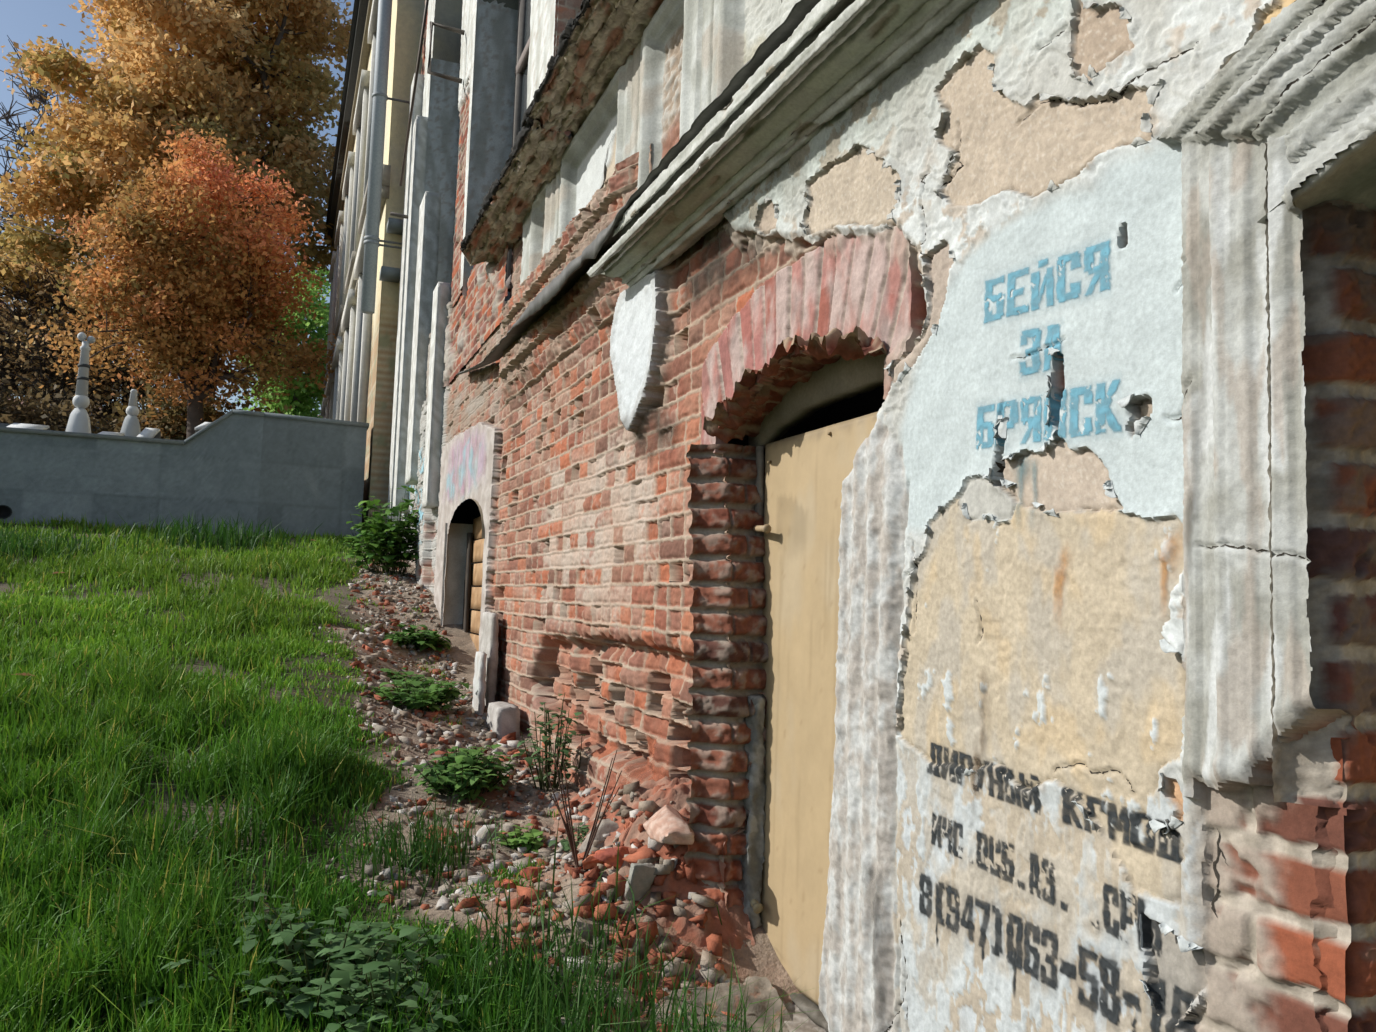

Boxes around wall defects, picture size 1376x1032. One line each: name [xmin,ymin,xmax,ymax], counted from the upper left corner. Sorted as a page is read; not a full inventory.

peeling [932,0,1165,206]
crack [1248,0,1376,135]
spalling [1117,222,1128,248]
spalling [495,143,901,790]
peeling [895,347,1357,1032]
spalling [717,826,746,912]